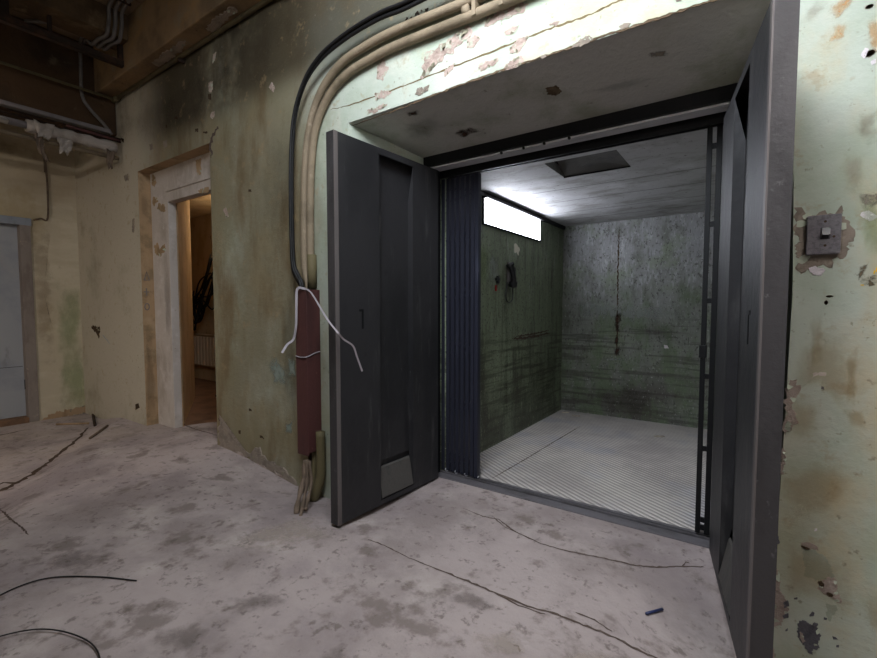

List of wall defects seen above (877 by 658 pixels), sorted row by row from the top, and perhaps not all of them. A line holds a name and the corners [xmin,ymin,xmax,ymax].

spalling [351,0,718,126]
peeling [792,205,855,276]
spalling [782,379,801,435]
crack [0,428,88,535]
crack [463,508,703,568]
crack [368,539,657,658]
flaking render [774,569,827,655]